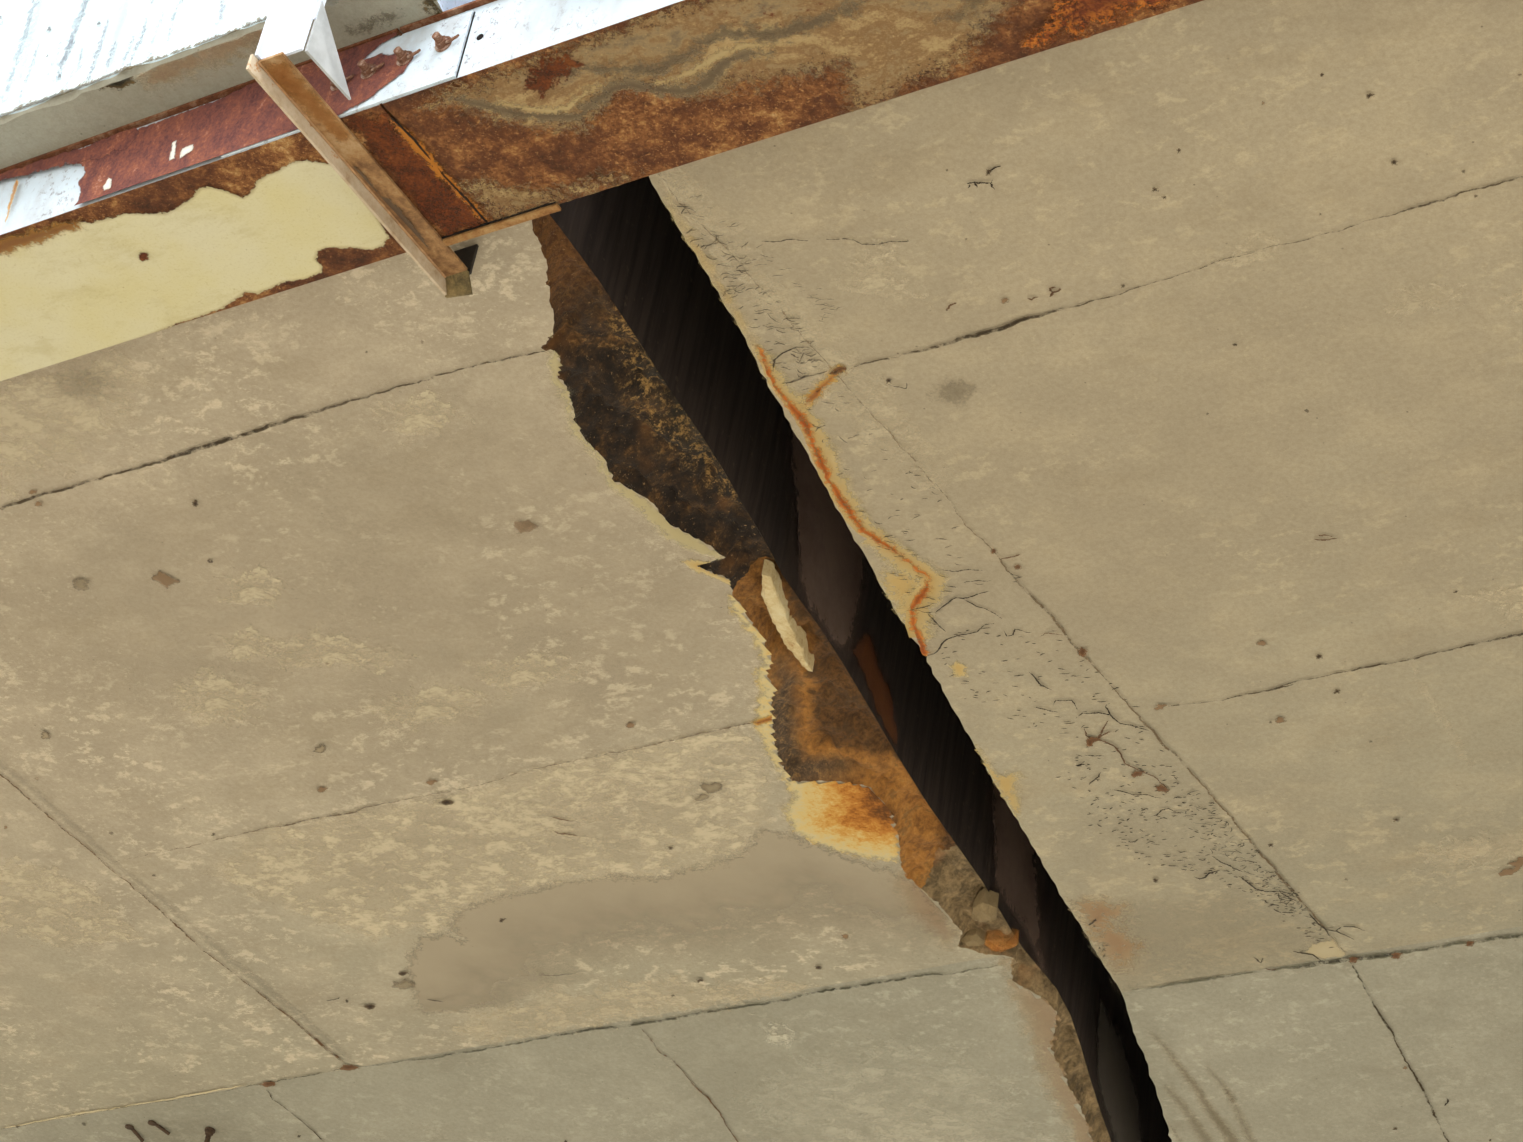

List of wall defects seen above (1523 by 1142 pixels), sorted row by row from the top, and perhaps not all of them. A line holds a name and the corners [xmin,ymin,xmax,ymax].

peeling [0,159,390,381]
rust [0,32,487,255]
rust [523,51,587,99]
crack [967,166,1001,190]
rust [1021,0,1170,48]
spalling [532,214,1111,1142]
rust [755,346,946,656]
crack [677,195,1365,970]
leakage [224,727,943,1042]